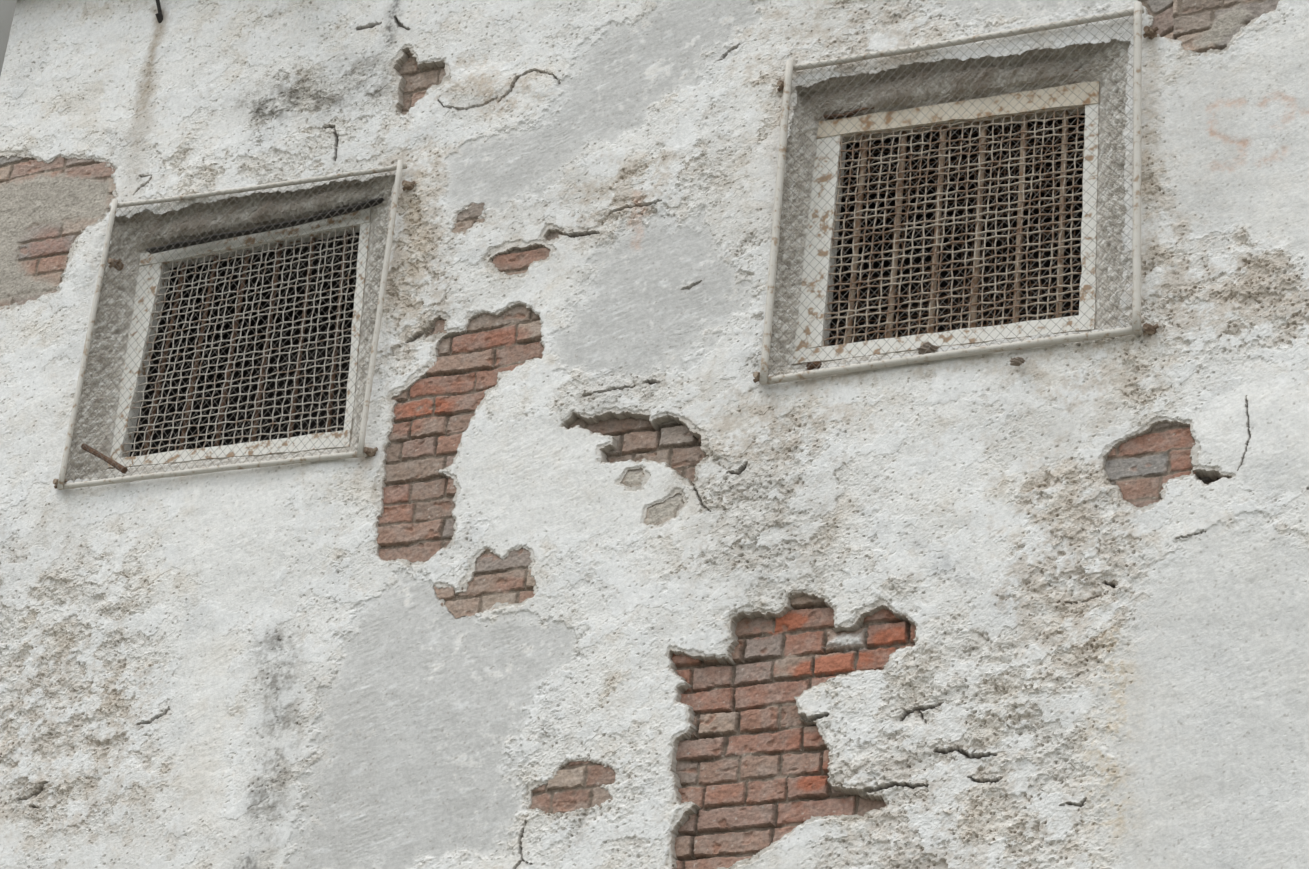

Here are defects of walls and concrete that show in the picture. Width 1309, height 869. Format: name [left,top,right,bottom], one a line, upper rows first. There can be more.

spalling [392,46,446,115]
peeling [926,0,1116,34]
peeling [1137,0,1309,260]
spalling [0,154,116,310]
peeling [282,206,757,869]
spalling [1101,419,1235,508]
crack [1237,395,1251,471]
spalling [667,591,917,869]